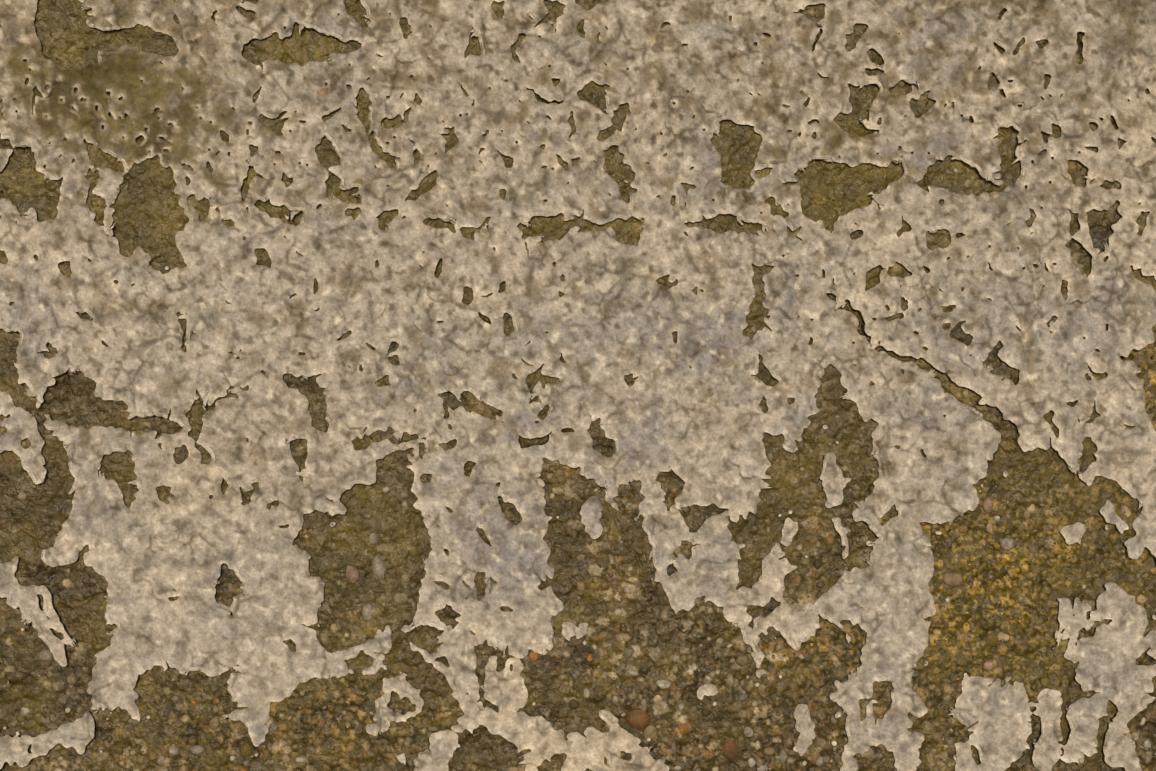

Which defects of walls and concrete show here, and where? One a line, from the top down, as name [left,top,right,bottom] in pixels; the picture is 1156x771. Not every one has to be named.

peeling [0,0,375,280]
peeling [395,14,419,46]
peeling [310,79,520,248]
peeling [459,0,616,69]
peeling [513,75,650,253]
peeling [786,0,832,28]
peeling [828,18,945,144]
peeling [665,111,1155,333]
peeling [982,32,1056,95]
peeling [1040,70,1057,100]
peeling [0,256,1156,771]